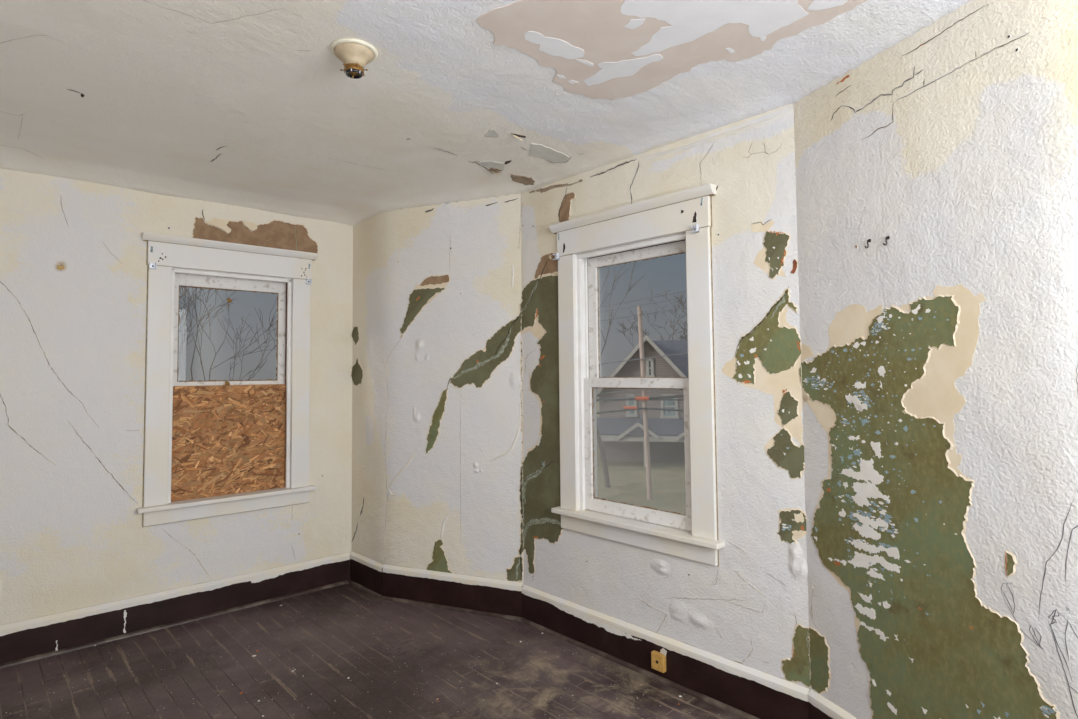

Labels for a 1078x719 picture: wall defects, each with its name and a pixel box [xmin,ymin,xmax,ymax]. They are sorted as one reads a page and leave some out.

peeling [477,0,867,101]
crack [831,31,1029,140]
peeling [484,129,570,163]
peeling [191,210,319,270]
peeling [399,274,450,339]
crack [0,279,138,504]
peeling [425,161,583,582]
peeling [722,219,1060,719]